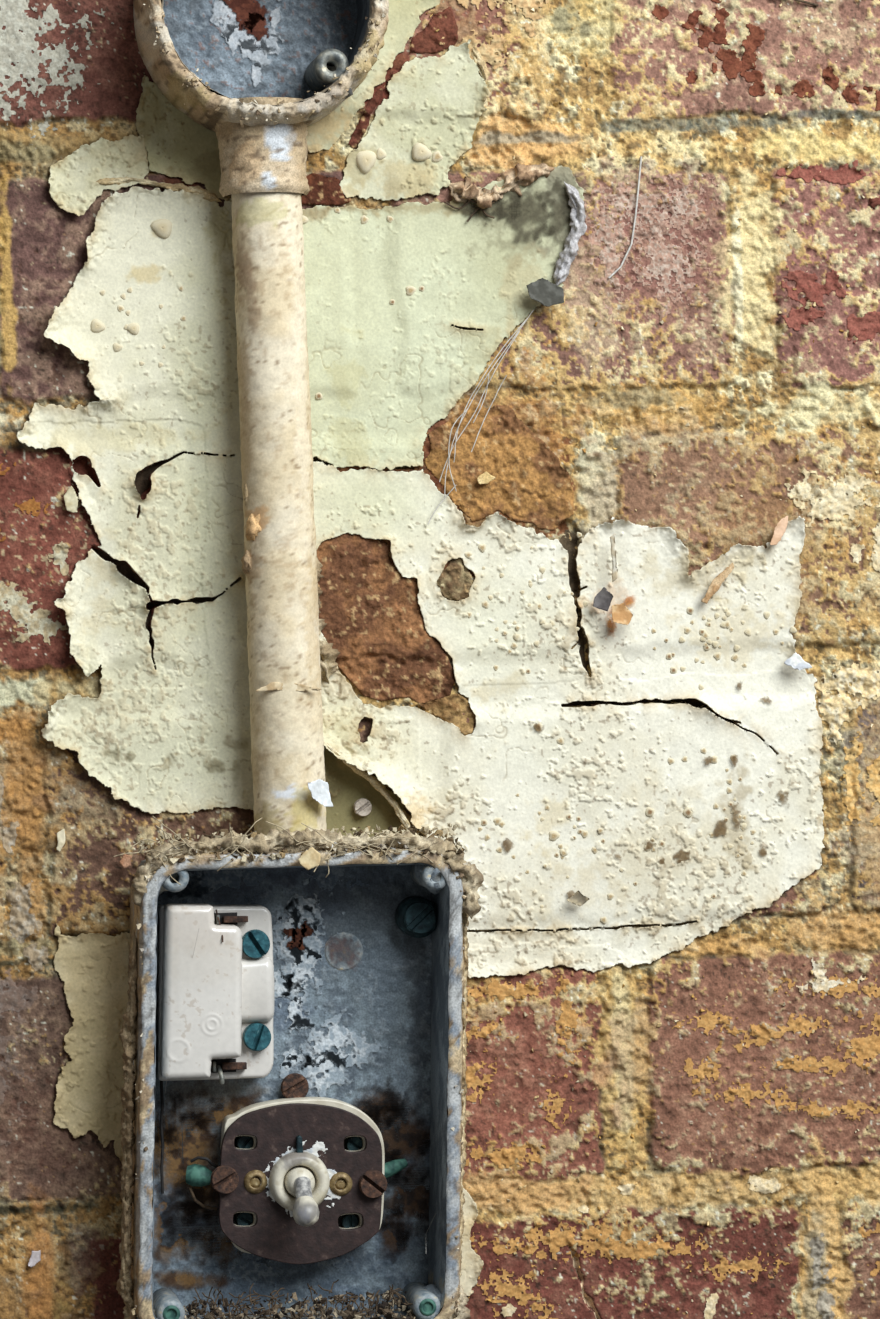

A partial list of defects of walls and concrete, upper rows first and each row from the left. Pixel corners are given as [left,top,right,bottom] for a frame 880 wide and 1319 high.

spalling [681,0,880,111]
crack [73,457,97,485]
crack [135,451,232,514]
crack [313,456,332,466]
peeling [16,0,825,978]
crack [92,548,235,664]
crack [559,529,775,752]
peeling [53,924,130,1162]